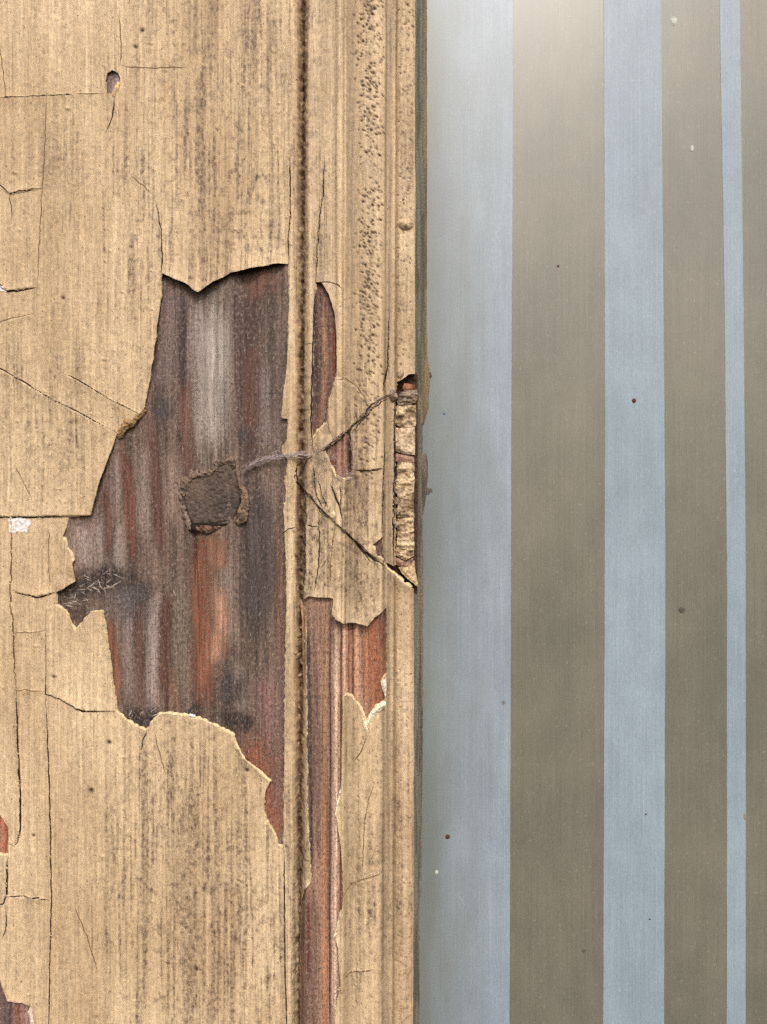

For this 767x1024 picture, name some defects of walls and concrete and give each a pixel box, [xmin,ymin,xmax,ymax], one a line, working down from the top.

peeling [106,71,120,97]
crack [0,52,115,322]
crack [133,177,163,271]
crack [0,368,117,433]
crack [64,373,139,414]
crack [283,166,396,591]
peeling [373,383,418,586]
peeling [57,263,387,1024]
crack [0,470,114,1024]